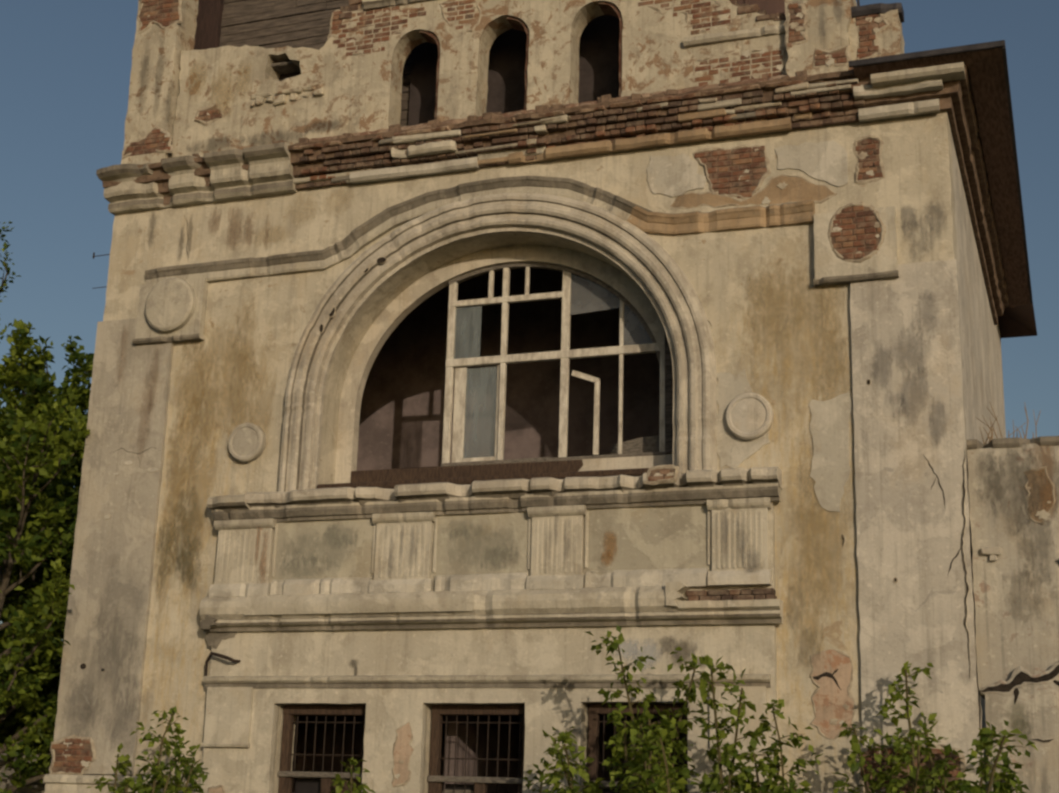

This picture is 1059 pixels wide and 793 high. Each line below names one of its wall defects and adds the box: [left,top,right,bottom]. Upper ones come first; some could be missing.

flaking render [136,0,182,34]
flaking render [327,3,426,56]
flaking render [438,0,481,32]
flaking render [638,0,731,35]
flaking render [122,126,174,160]
flaking render [853,135,885,185]
flaking render [670,144,887,263]
flaking render [1023,466,1057,525]
crack [923,449,1059,784]
flaking render [809,648,857,740]
flaking render [49,734,96,775]
flaking render [391,722,414,787]